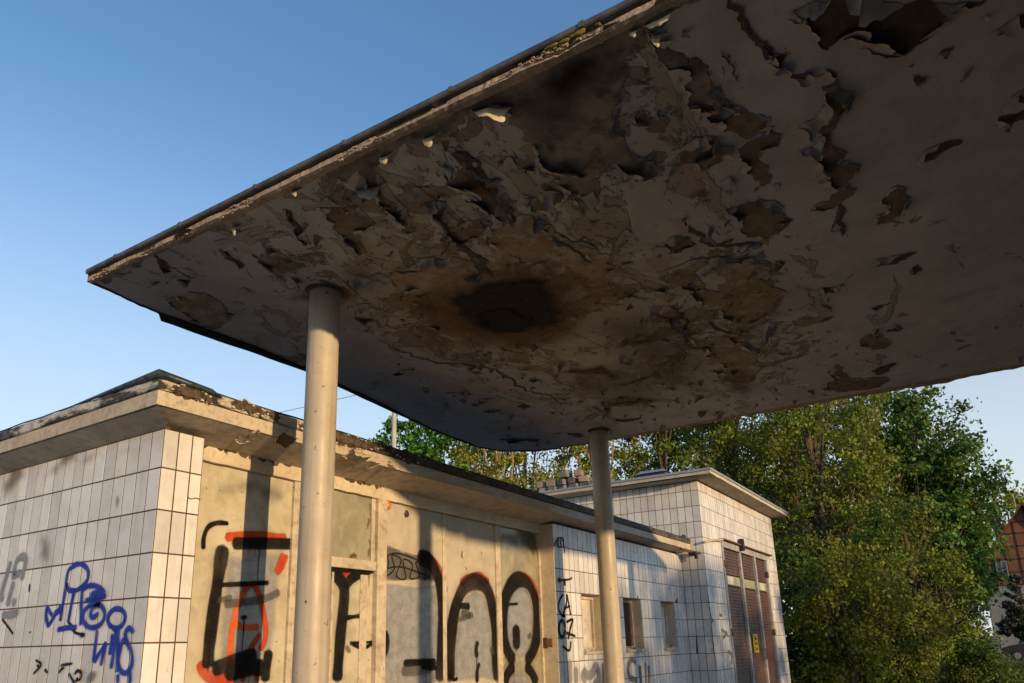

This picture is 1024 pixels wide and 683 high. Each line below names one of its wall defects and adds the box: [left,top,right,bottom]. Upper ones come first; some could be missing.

peeling [788,0,1024,59]
peeling [874,186,911,225]
peeling [319,21,903,448]
peeling [92,195,292,330]
water stain [454,281,558,334]
spalling [171,384,213,405]
spalling [230,398,303,448]
spalling [336,434,426,470]